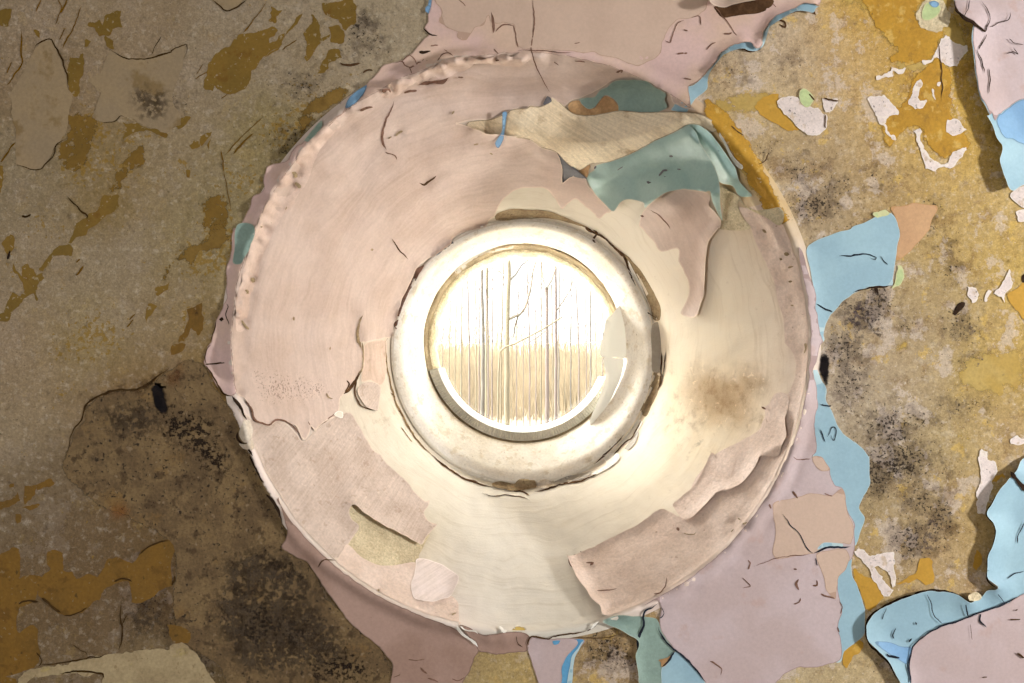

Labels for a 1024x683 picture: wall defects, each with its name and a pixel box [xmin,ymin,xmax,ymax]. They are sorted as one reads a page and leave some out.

peeling [913,0,1024,222]
water stain [111,384,229,481]
peeling [203,0,941,683]
water stain [819,354,830,385]
water stain [848,301,873,337]
peeling [967,269,1024,320]
flaking render [0,360,585,683]
water stain [219,554,367,683]
peeling [866,449,1024,683]